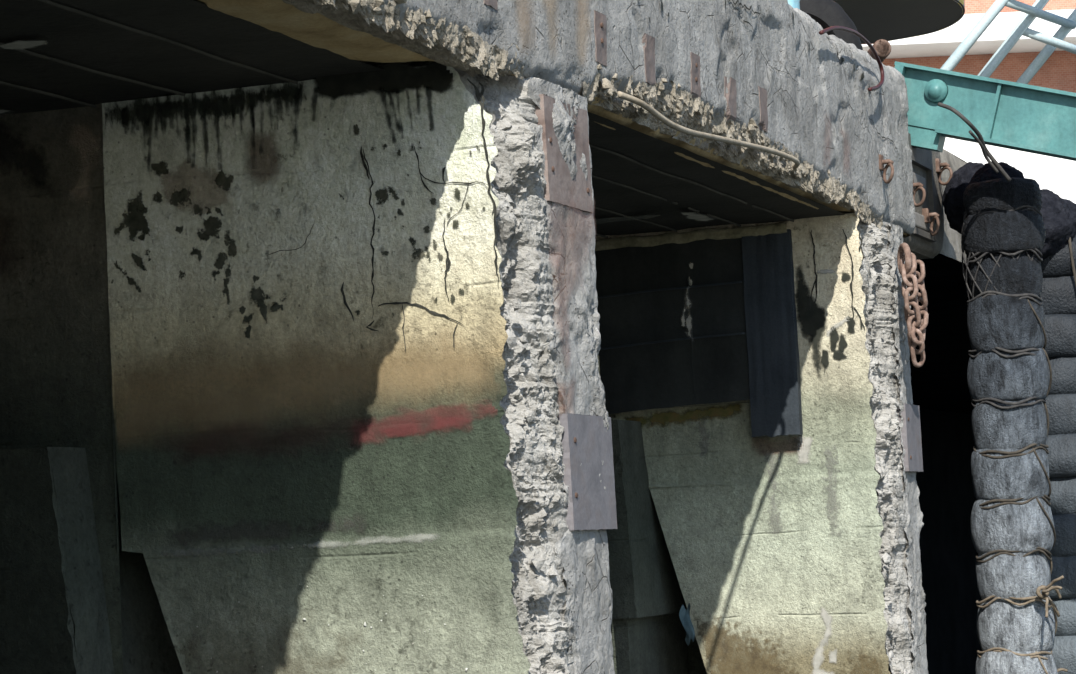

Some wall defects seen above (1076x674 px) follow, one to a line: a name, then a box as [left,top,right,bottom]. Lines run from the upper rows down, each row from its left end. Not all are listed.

peeling [151,161,169,176]
peeling [111,188,285,338]
peeling [215,170,234,191]
damp [105,61,453,169]
crack [340,79,499,351]
spalling [282,0,575,674]
spalling [580,64,914,674]
damp [796,265,862,376]
damp [813,608,837,674]